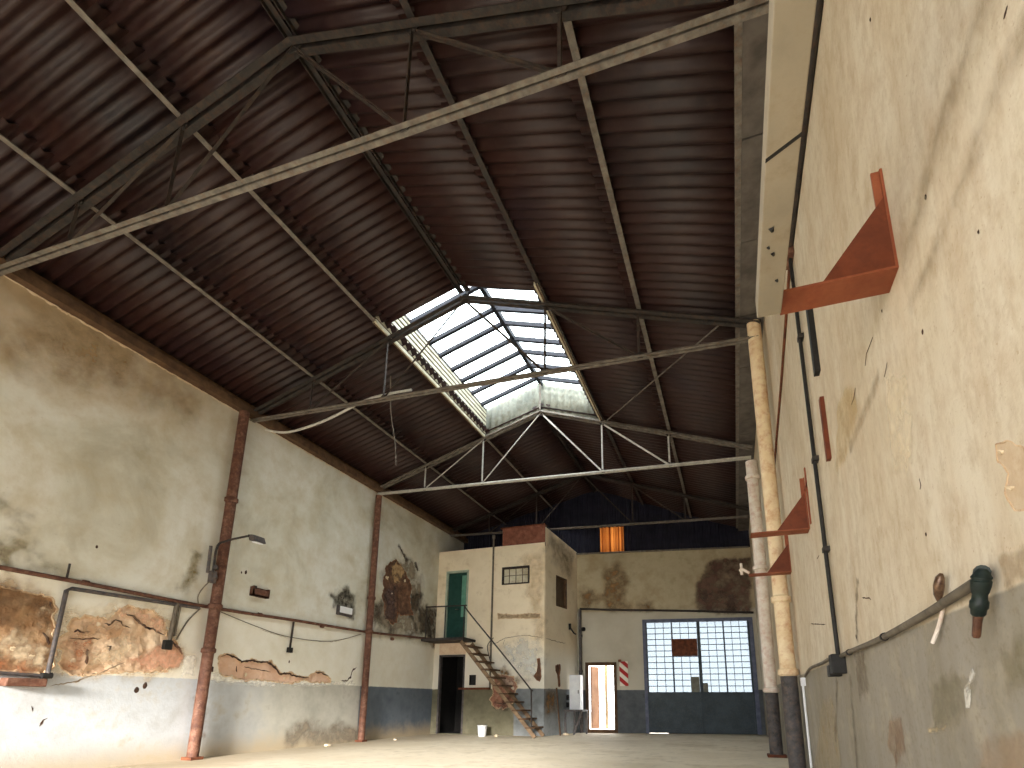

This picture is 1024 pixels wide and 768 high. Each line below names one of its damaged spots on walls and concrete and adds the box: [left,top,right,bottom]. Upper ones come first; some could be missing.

flaking render [995,440,1024,512]
flaking render [382,559,414,625]
flaking render [0,585,184,693]
flaking render [212,653,331,685]